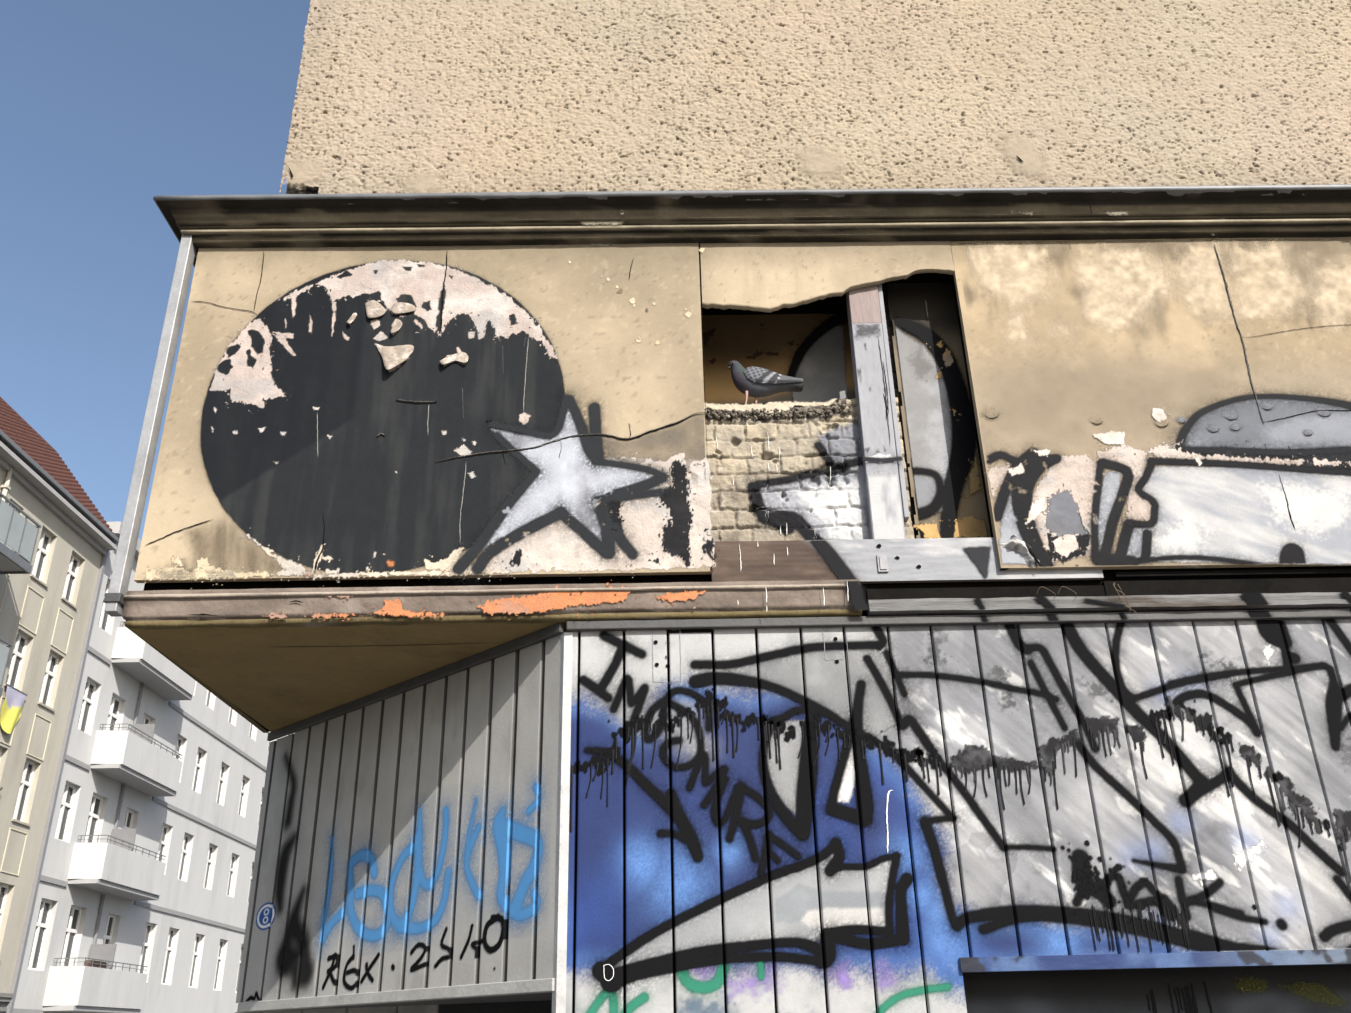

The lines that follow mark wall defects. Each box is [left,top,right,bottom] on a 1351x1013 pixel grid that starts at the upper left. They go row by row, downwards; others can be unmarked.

peeling [201,258,558,430]
peeling [143,449,719,621]
peeling [454,439,477,456]
crack [436,412,707,463]
flaking render [926,341,953,379]
peeling [913,405,1351,567]
crack [1214,245,1351,423]